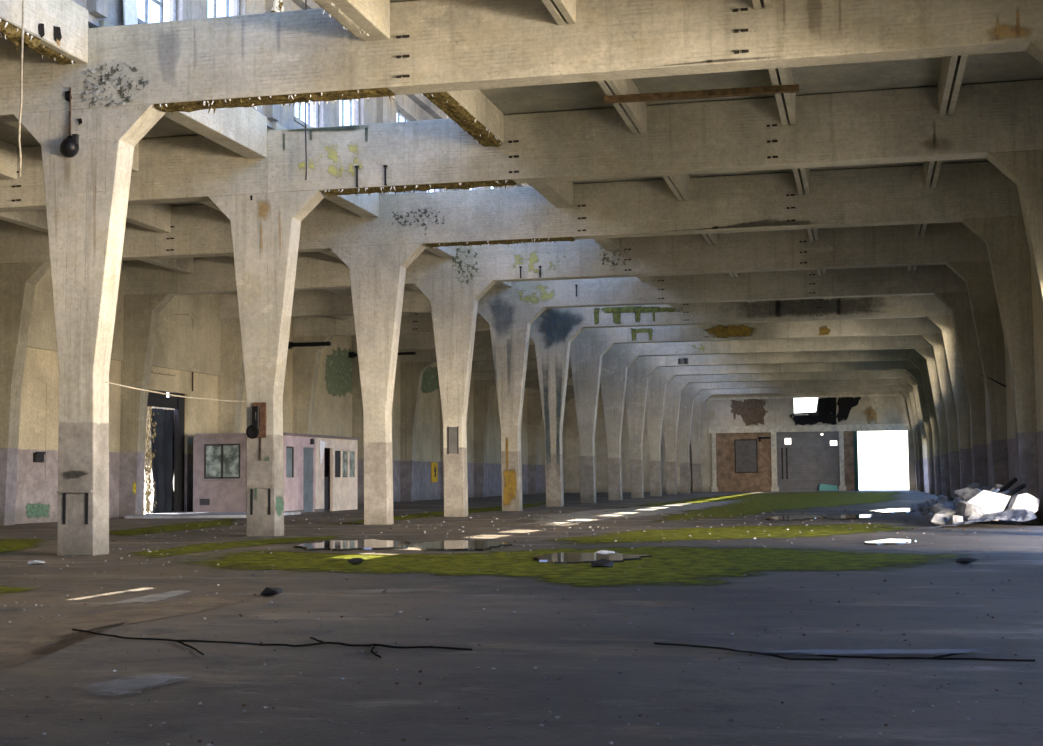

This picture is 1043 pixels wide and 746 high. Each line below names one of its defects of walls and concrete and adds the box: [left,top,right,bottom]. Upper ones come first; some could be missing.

corrosion [991,10,1029,39]
damp [392,208,444,235]
crack [72,629,472,658]
crack [654,642,1035,662]